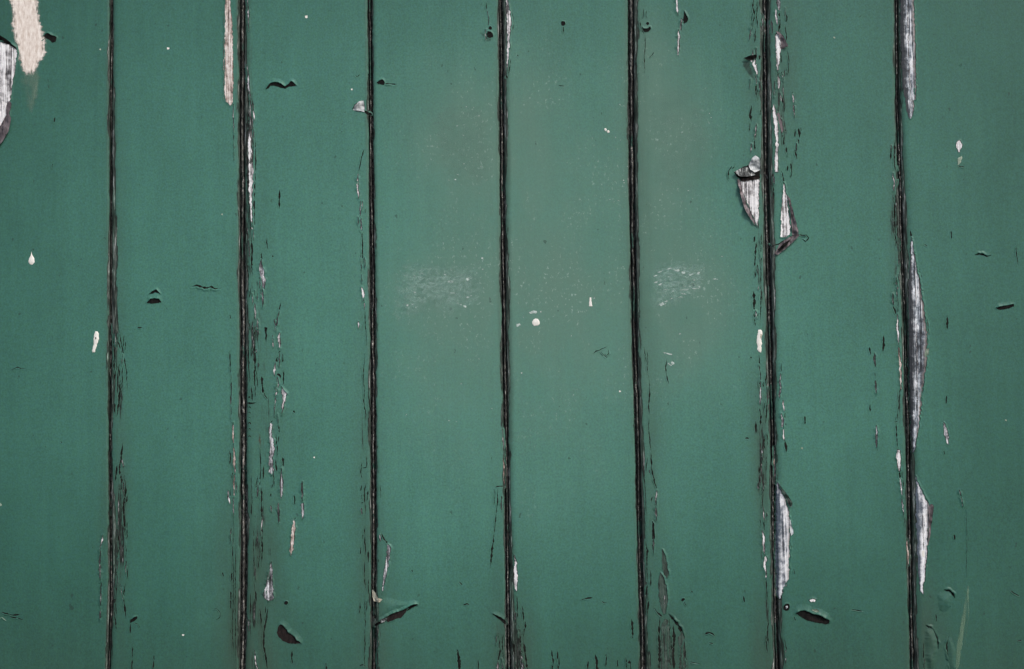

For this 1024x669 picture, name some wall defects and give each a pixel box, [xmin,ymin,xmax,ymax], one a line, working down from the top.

peeling [0,0,58,144]
peeling [726,0,809,255]
peeling [899,0,919,120]
peeling [221,0,307,557]
peeling [755,354,794,601]
peeling [867,231,934,596]
peeling [252,547,304,669]
peeling [372,532,420,627]
peeling [793,596,833,625]